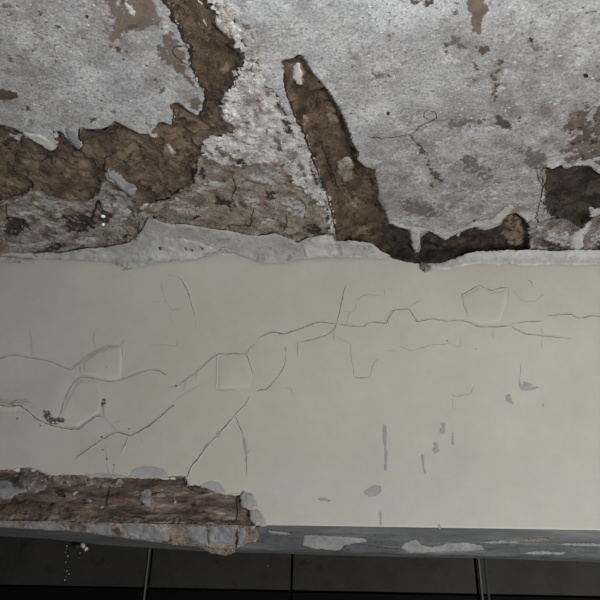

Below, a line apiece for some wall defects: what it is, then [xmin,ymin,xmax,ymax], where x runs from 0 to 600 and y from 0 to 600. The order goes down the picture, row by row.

spalling [0,0,600,272]
crack [370,110,448,157]
crack [0,275,600,478]
spalling [0,466,290,556]
peeling [302,535,600,555]